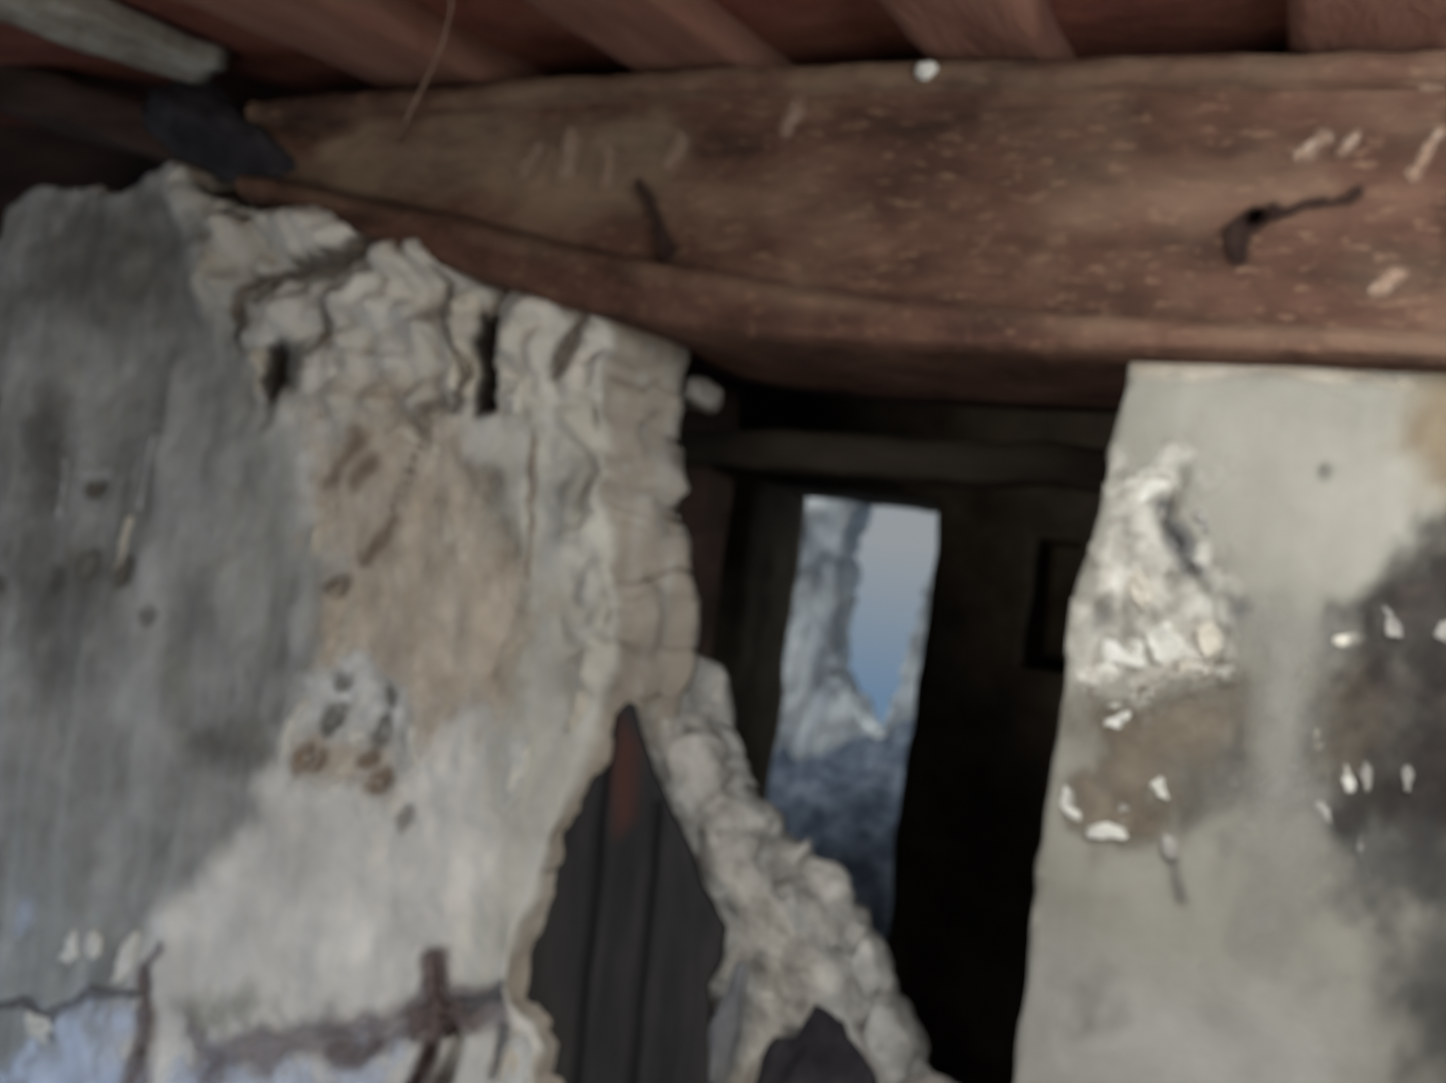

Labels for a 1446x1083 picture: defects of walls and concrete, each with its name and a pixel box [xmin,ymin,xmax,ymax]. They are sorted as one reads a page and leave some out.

spalling [249,341,303,416]
crack [229,238,378,356]
crack [391,266,472,509]
spalling [446,291,522,416]
peeling [278,386,531,797]
spalling [1060,442,1264,862]
crack [0,925,162,1083]
crack [189,951,509,1083]